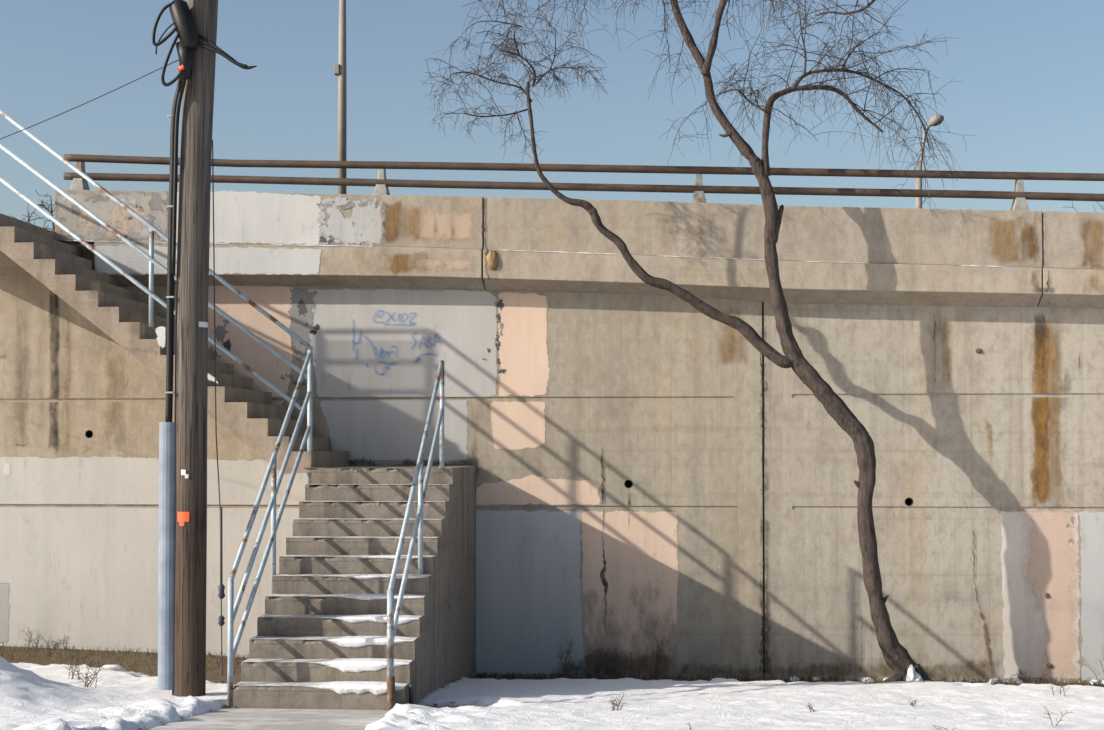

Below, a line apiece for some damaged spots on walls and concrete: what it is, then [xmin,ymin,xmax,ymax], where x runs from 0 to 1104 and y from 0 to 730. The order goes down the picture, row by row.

peeling [56,191,168,242]
peeling [317,195,389,246]
rust [382,203,419,241]
rust [390,255,415,273]
rust [992,218,1037,261]
peeling [288,287,317,361]
water stain [49,294,58,444]
rust [1032,319,1060,499]
crack [600,448,608,632]
crack [973,532,993,673]